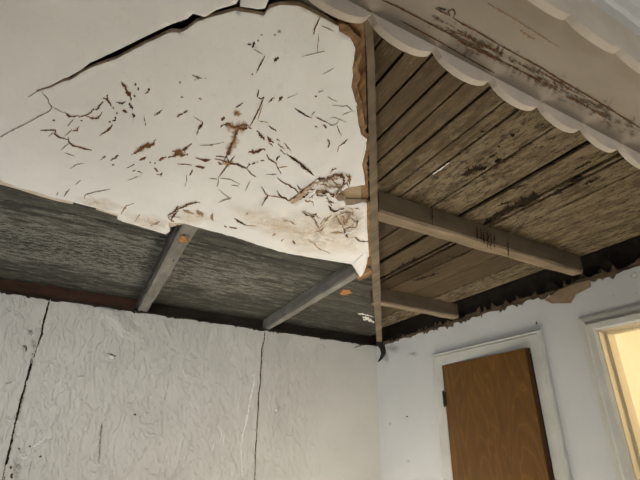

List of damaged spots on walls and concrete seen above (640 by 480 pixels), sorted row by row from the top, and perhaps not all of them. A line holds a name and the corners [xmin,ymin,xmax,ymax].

peeling [435,17,634,135]
rust [221,123,252,161]
peeling [289,168,362,237]
crack [2,300,50,480]
crack [254,333,265,480]